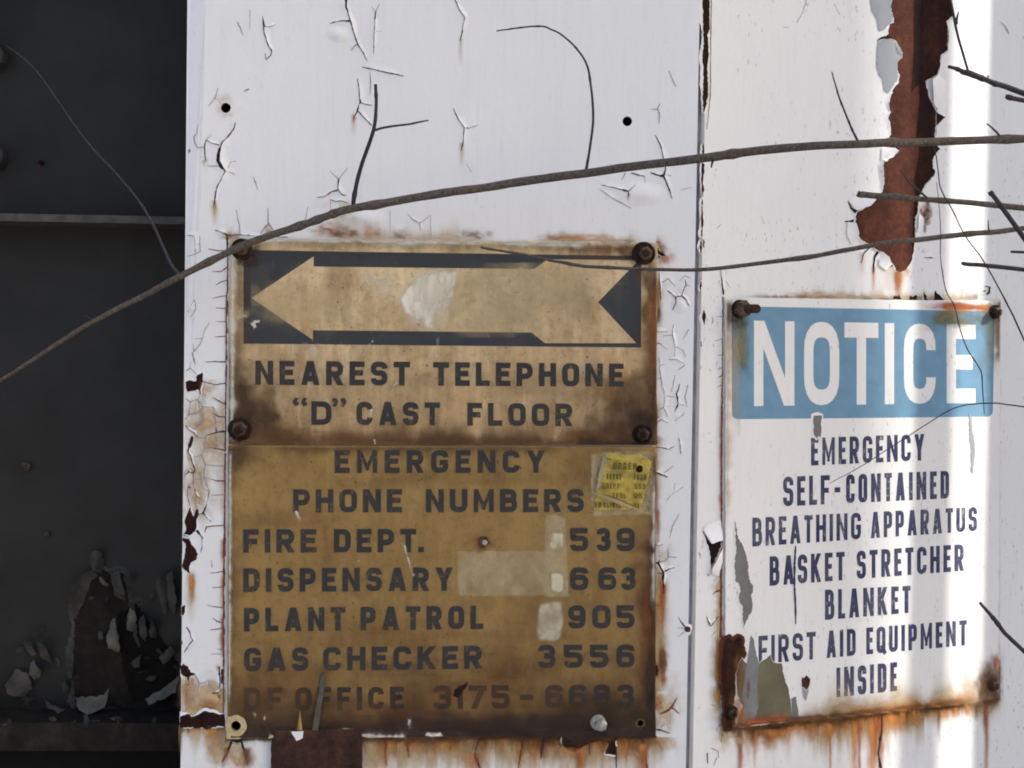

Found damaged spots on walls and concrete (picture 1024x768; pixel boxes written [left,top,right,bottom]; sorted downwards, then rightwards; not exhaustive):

crack [237,16,276,60]
crack [329,0,404,126]
crack [453,107,478,173]
crack [600,72,692,208]
peeling [845,0,956,274]
rust [556,235,634,260]
peeling [184,371,205,397]
crack [181,123,349,713]
crack [655,270,730,638]
rust [179,277,672,768]
peeling [5,503,227,730]
rust [720,657,1001,768]